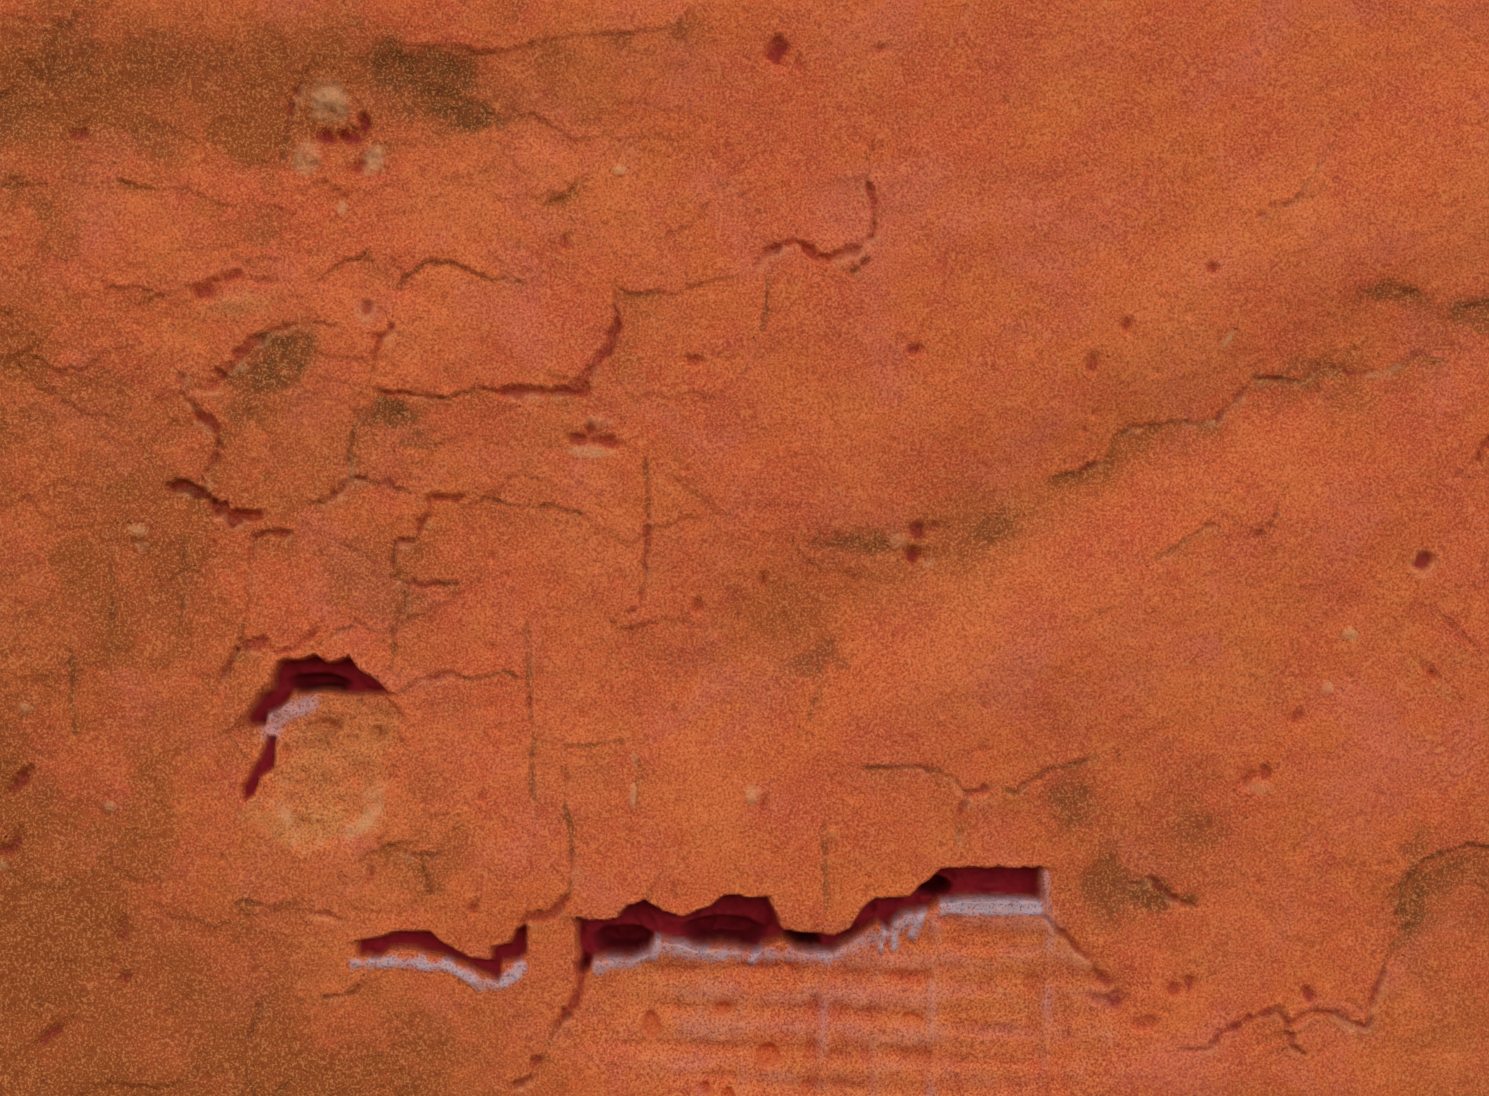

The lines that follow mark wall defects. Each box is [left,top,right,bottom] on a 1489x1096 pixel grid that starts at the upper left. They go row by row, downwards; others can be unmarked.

crack [746,138,887,343]
crack [157,255,635,943]
crack [618,448,660,623]
crack [1030,345,1462,495]
crack [1461,435,1489,477]
spalling [210,619,409,895]
spalling [347,928,531,995]
spalling [556,863,1201,1096]
crack [1114,870,1208,918]
crack [1164,837,1489,1067]